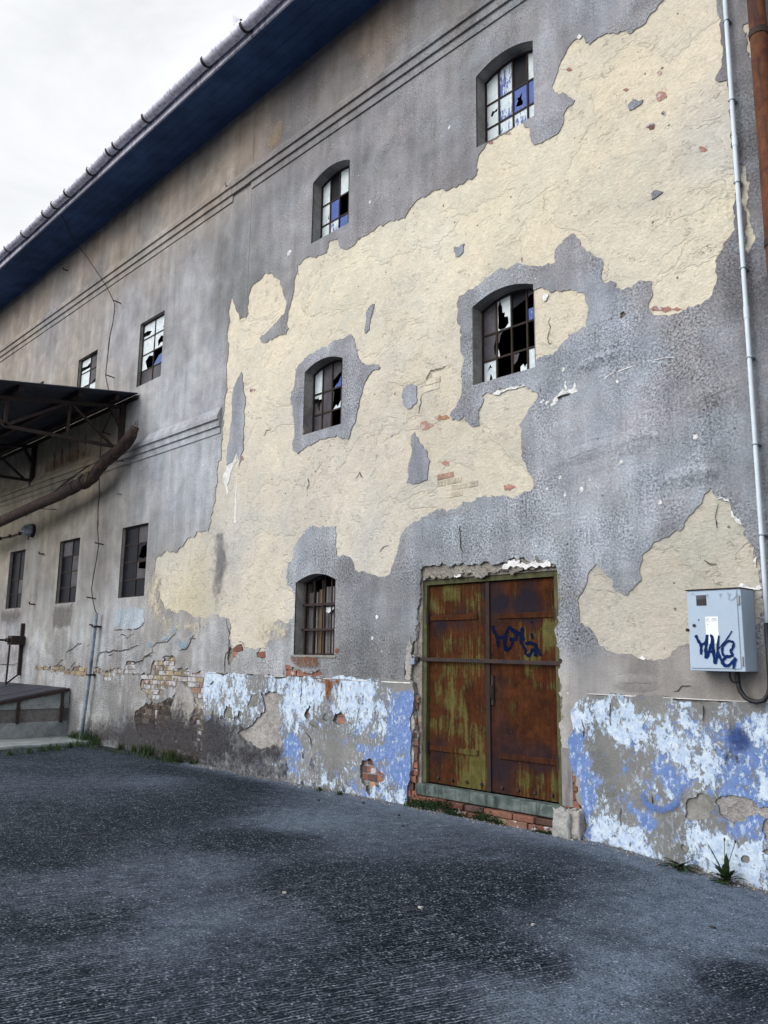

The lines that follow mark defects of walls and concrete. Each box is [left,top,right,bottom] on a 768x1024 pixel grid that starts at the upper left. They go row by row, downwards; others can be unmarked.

flaking render [113,0,764,665]
flaking render [36,656,205,763]
crack [54,623,195,669]
spalling [224,691,282,750]
spalling [405,557,561,801]
flaking render [362,759,384,789]
spalling [561,743,582,811]
spalling [686,793,768,854]